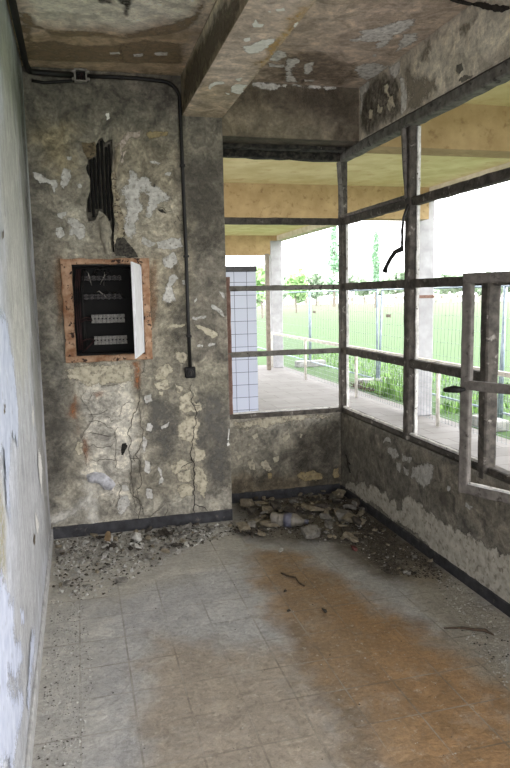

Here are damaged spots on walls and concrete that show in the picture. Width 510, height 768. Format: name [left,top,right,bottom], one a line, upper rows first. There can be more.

leakage [19,0,204,63]
peeling [209,37,336,95]
peeling [350,19,418,120]
leakage [362,43,436,134]
peeling [33,156,82,192]
peeling [56,212,86,240]
peeling [111,170,185,303]
peeling [167,305,225,347]
crack [81,362,168,519]
crack [181,384,206,513]
peeling [383,437,434,489]
flaking render [333,468,510,604]